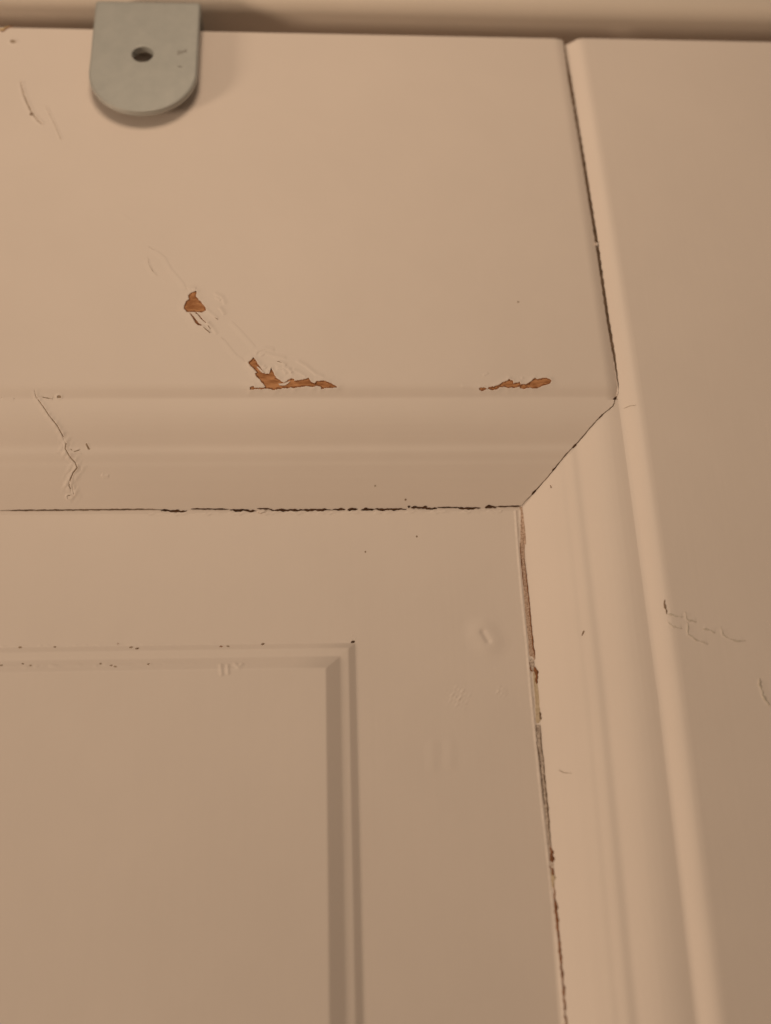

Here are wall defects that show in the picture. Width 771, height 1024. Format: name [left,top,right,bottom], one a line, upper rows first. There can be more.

peeling [176,284,230,335]
peeling [240,345,345,397]
peeling [460,371,557,396]
crack [0,38,636,1024]